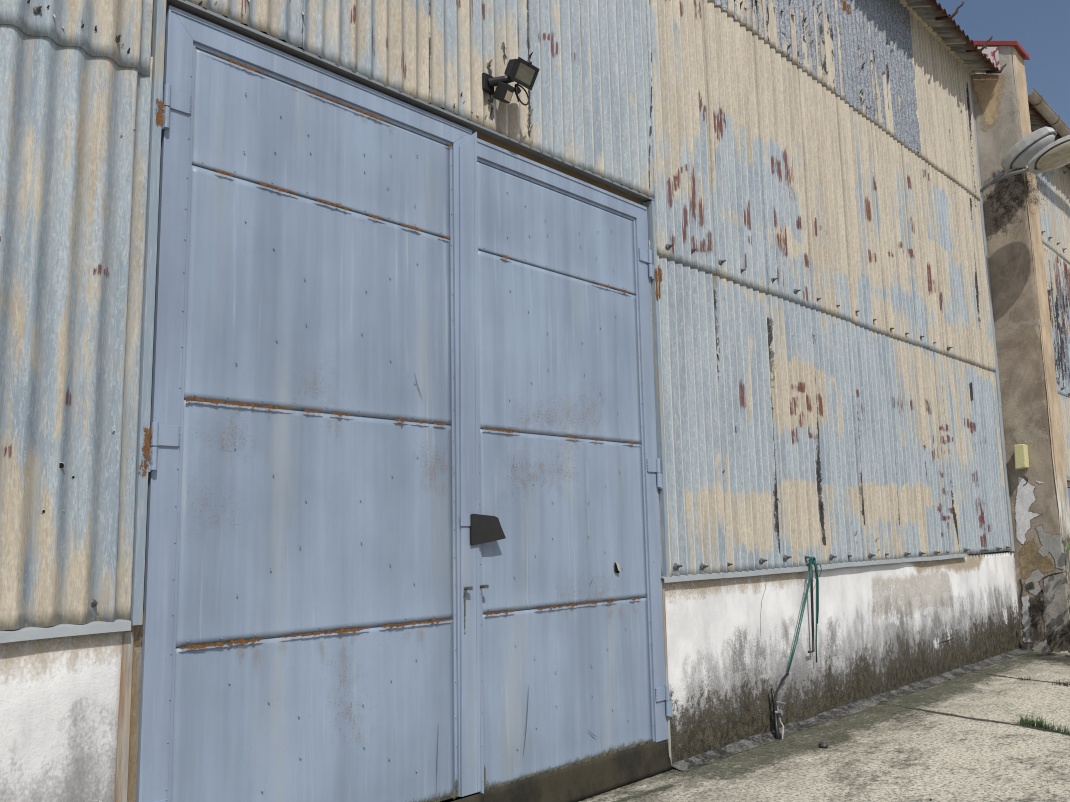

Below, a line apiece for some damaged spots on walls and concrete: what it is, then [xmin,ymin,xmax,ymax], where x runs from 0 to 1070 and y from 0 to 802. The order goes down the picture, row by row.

peeling [699,92,727,143]
damp [984,168,1051,238]
corrosion [138,427,153,477]
corrosion [186,368,356,455]
corrosion [483,384,605,496]
corrosion [178,638,265,650]
corrosion [280,592,466,638]
damp [665,572,802,593]
spalling [1014,477,1070,653]
damp [670,582,1070,782]